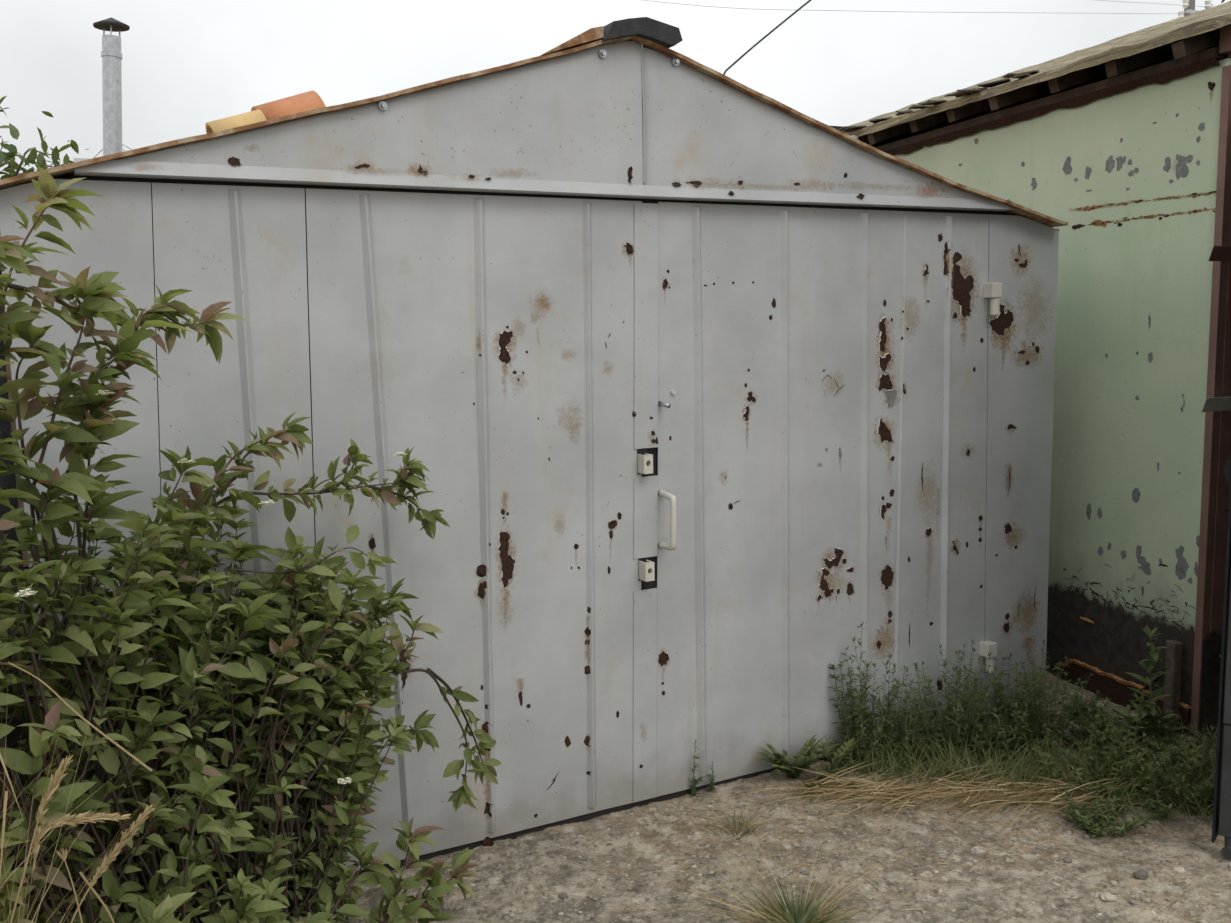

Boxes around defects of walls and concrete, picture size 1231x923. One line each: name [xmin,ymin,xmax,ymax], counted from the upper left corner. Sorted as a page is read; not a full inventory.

peeling [1062,138,1139,192]
rust [1072,191,1216,230]
rust [980,304,1014,348]
rust [479,325,524,381]
rust [1019,342,1040,365]
rust [877,417,895,462]
rust [880,489,895,522]
rust [476,494,516,600]
rust [817,548,855,601]
peeling [1097,535,1199,584]
rust [658,651,670,667]
rust [1055,659,1164,718]